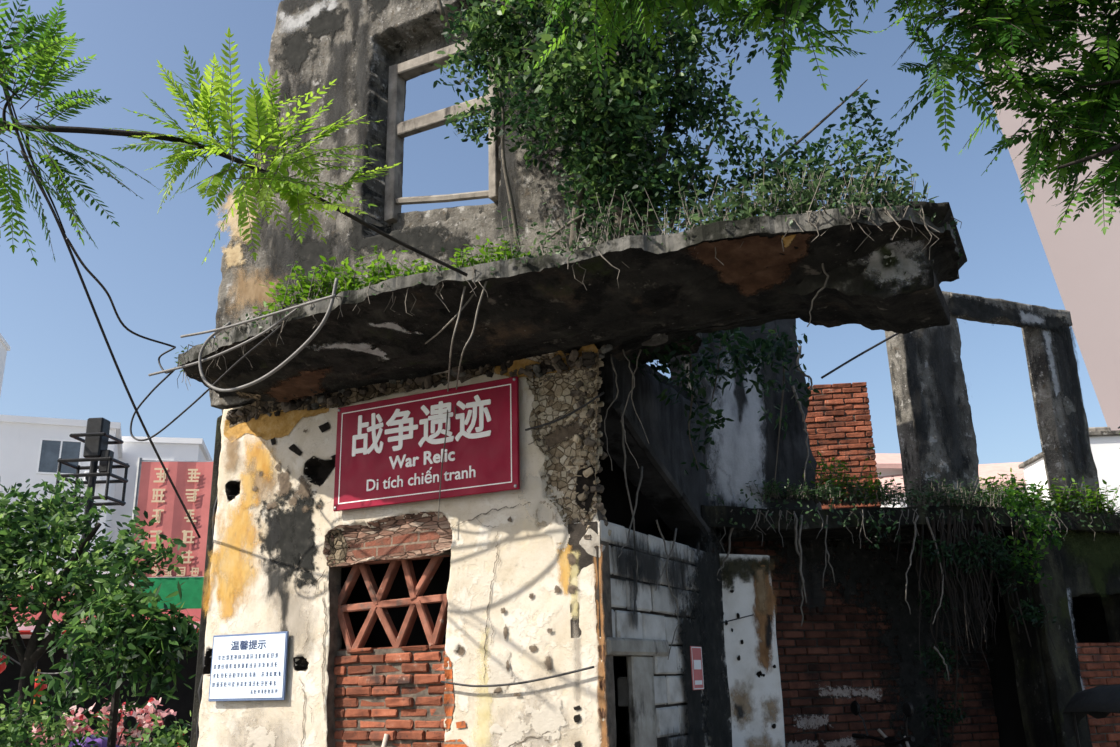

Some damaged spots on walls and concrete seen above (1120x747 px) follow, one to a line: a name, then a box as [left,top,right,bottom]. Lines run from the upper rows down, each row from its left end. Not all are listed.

damp [230,0,473,309]
damp [495,20,565,232]
flaking render [224,344,604,566]
damp [733,358,747,421]
damp [762,358,778,495]
damp [906,295,1092,479]
damp [204,460,323,652]
crack [451,502,531,678]
crack [508,634,581,747]
damp [615,519,858,747]